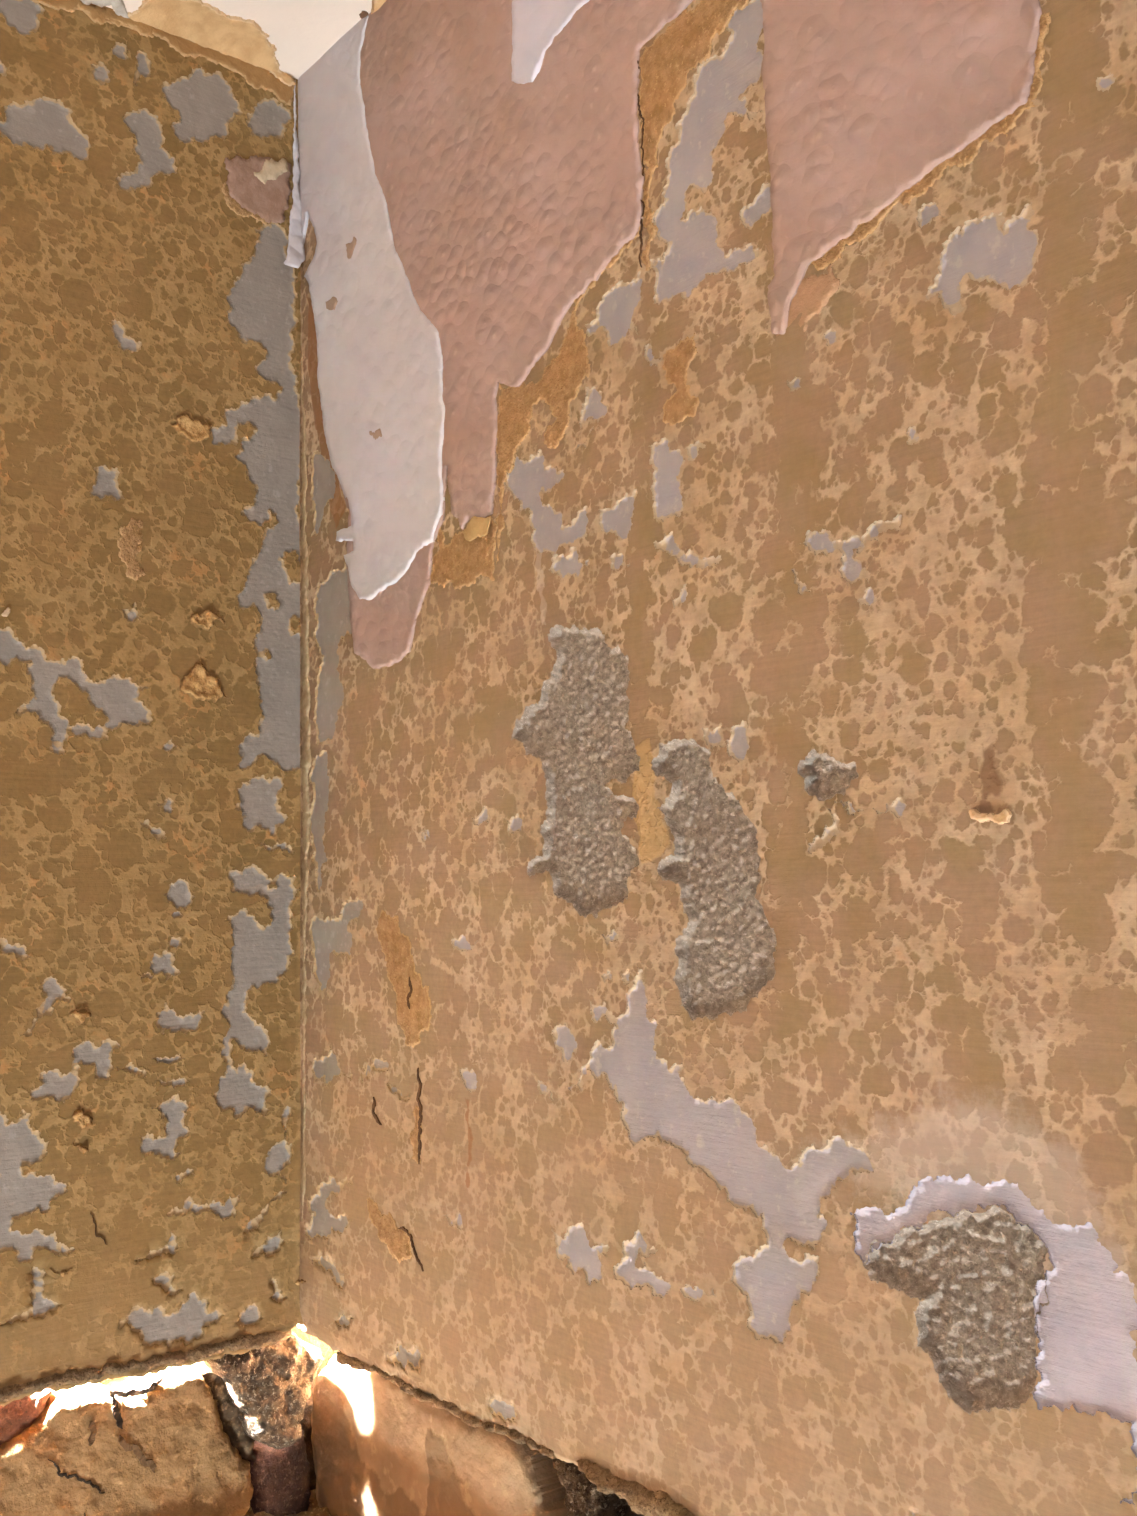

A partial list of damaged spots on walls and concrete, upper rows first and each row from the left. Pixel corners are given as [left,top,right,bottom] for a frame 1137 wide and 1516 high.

peeling [585,0,771,367]
peeling [916,202,1039,319]
peeling [504,387,722,609]
peeling [800,514,902,606]
peeling [0,222,363,1445]
flaking render [511,624,777,1021]
flaking render [797,749,907,854]
peeling [305,1175,414,1290]
flaking render [336,1343,556,1459]
flaking render [576,1459,695,1516]
peeling [537,965,876,1345]
flaking render [850,1173,1137,1470]